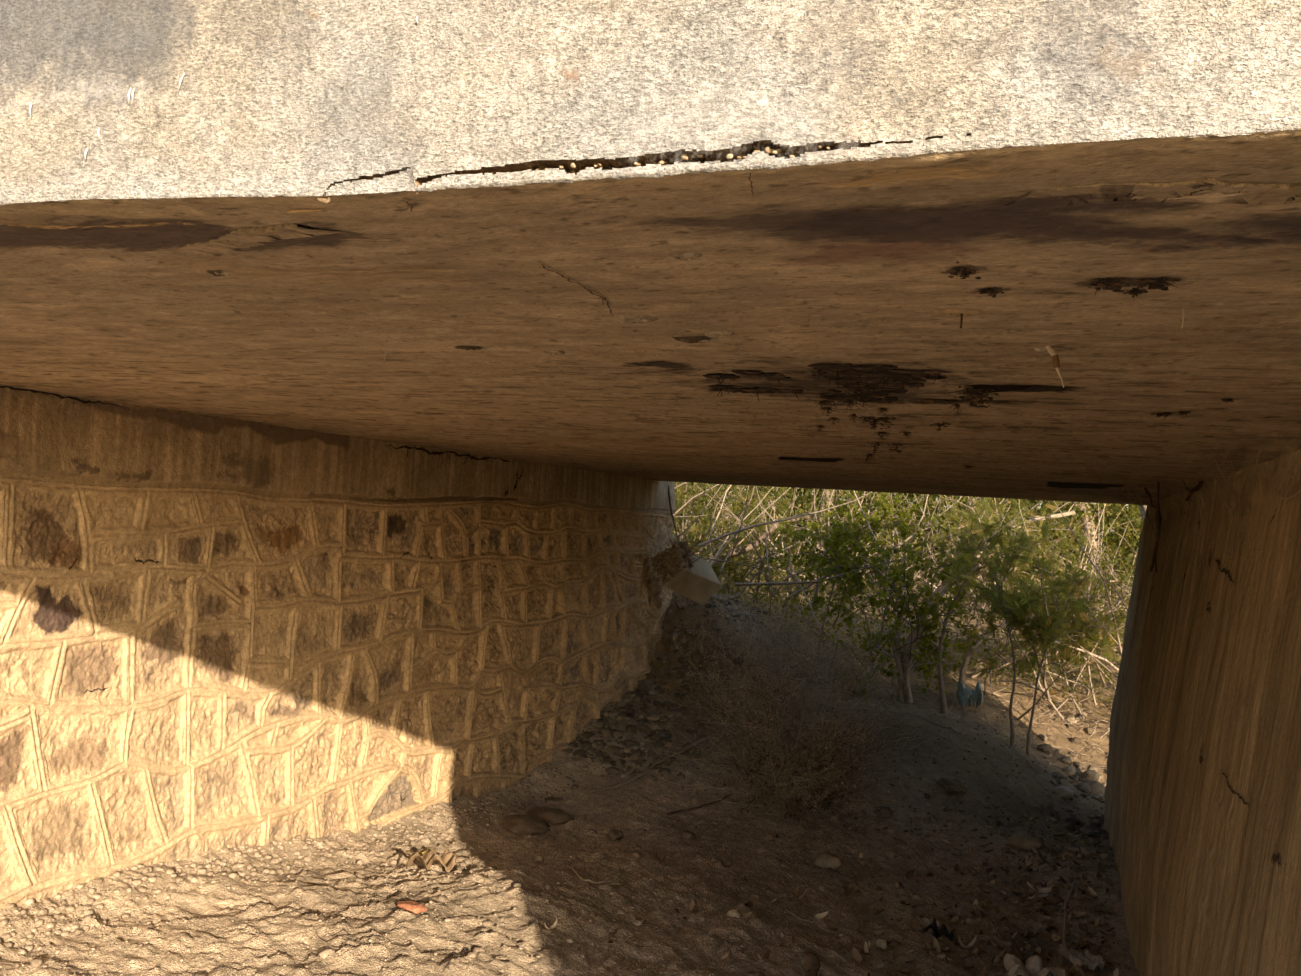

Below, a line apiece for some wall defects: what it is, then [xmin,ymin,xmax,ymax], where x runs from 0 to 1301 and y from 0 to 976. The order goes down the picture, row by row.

damp [0,219,366,252]
crack [175,133,972,258]
damp [660,194,1301,252]
flaking render [1183,192,1245,203]